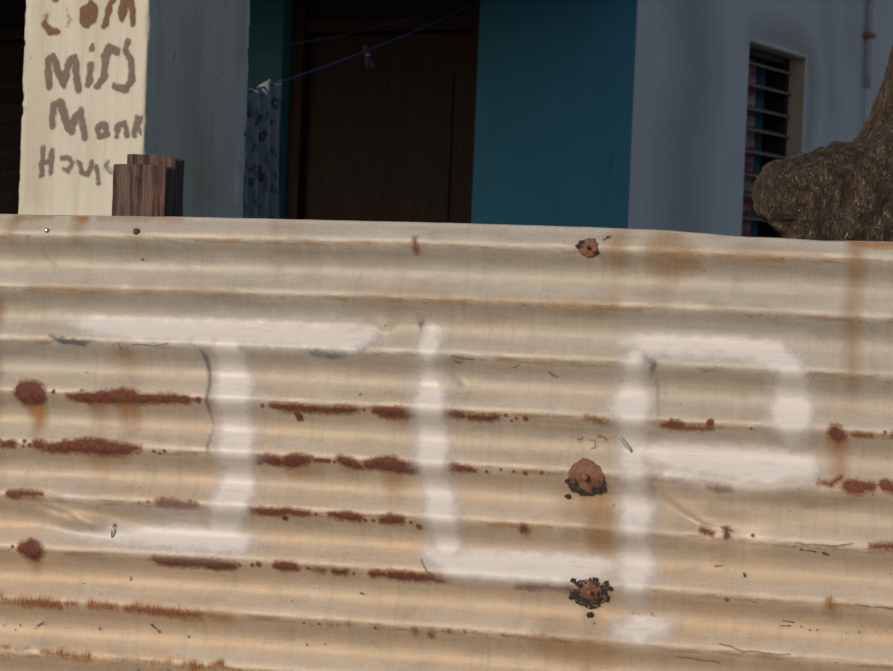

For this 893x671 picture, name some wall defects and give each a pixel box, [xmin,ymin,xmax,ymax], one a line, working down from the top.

corrosion [14,379,55,424]
corrosion [66,387,201,409]
corrosion [260,403,417,422]
corrosion [443,407,528,422]
corrosion [0,437,166,456]
corrosion [253,453,421,475]
corrosion [817,474,893,496]
corrosion [248,507,317,521]
corrosion [328,510,422,529]
corrosion [11,538,44,561]
corrosion [151,555,261,571]
corrosion [367,569,448,583]